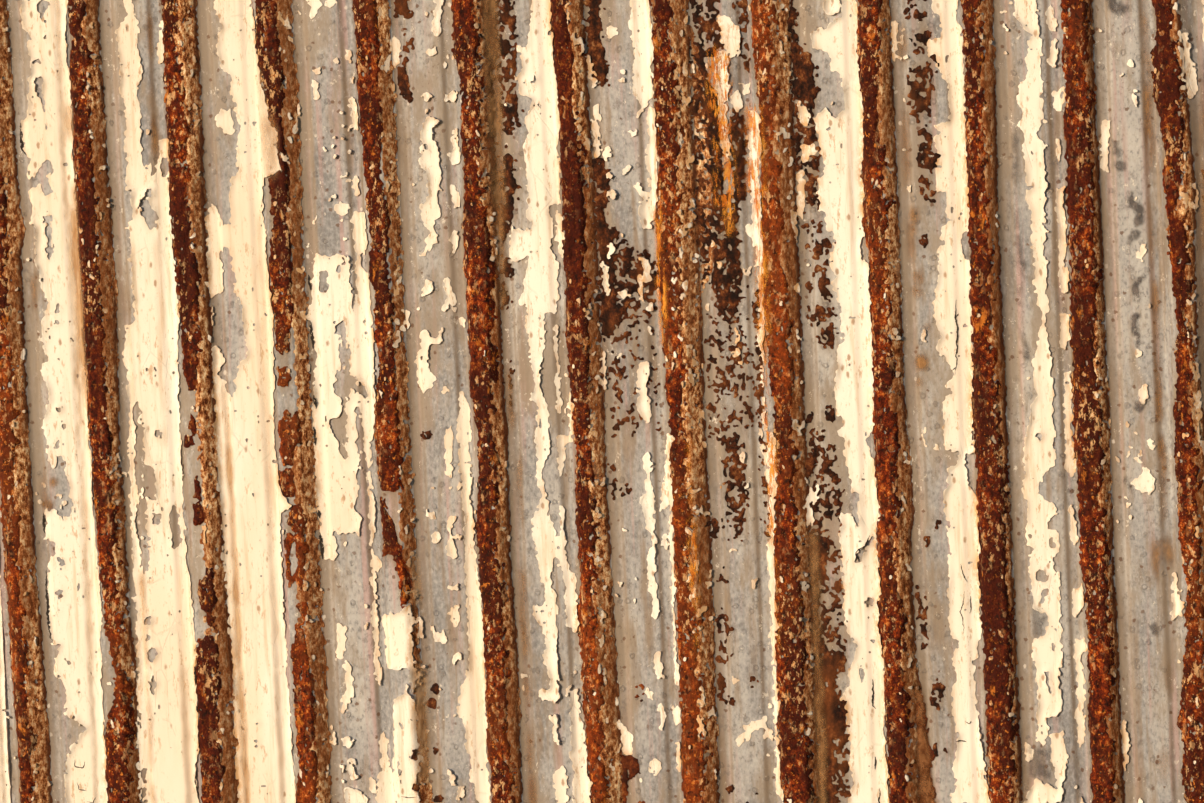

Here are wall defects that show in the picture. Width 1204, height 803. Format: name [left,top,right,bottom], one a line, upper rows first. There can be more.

corrosion [66,0,142,803]
corrosion [161,0,239,803]
peeling [0,0,491,803]
corrosion [451,0,524,803]
peeling [490,0,797,803]
corrosion [550,0,851,803]
peeling [776,0,899,803]
corrosion [856,0,947,803]
peeling [921,0,991,803]
corrosion [960,0,1023,803]
peeling [1000,0,1088,803]
peeling [1169,0,1204,99]